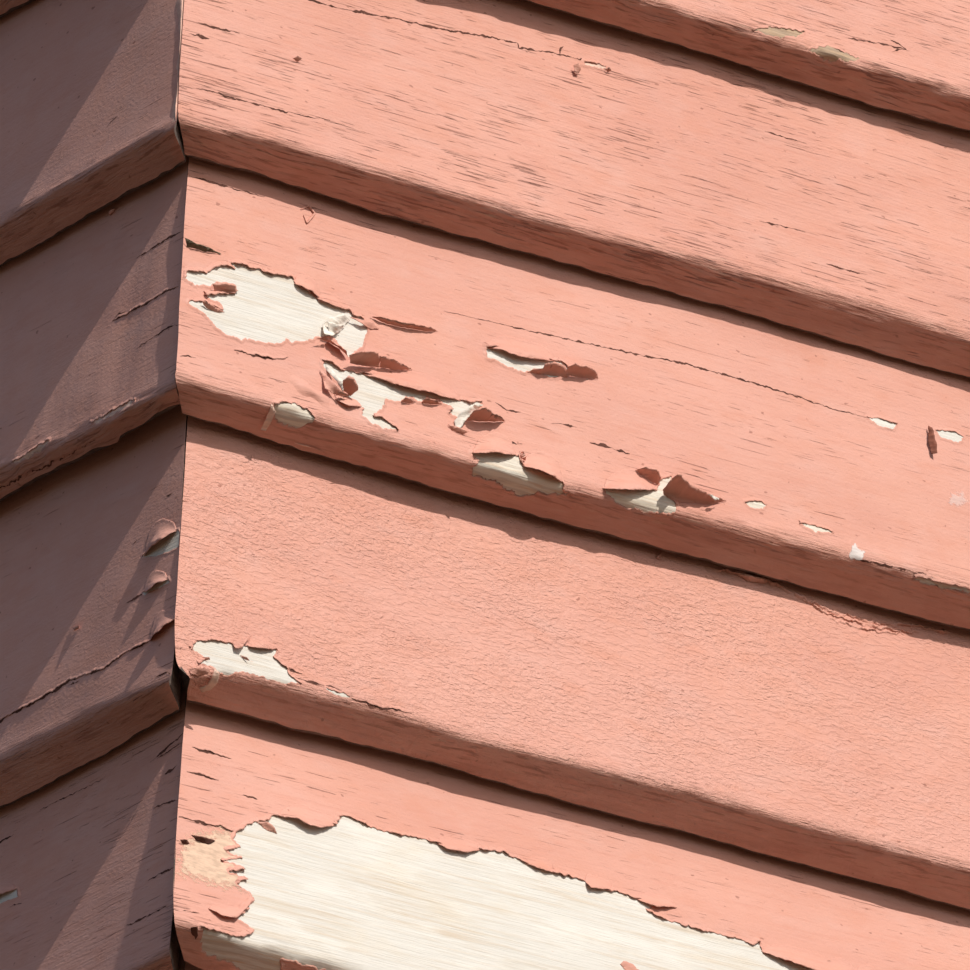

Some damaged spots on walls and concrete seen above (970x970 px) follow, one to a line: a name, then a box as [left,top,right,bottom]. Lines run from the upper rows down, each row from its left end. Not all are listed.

crack [192,23,238,39]
crack [309,0,582,60]
peeling [183,259,577,502]
peeling [482,335,598,381]
peeling [601,467,726,518]
peeling [141,518,180,598]
crack [0,638,152,723]
peeling [188,633,303,692]
peeling [196,803,875,970]